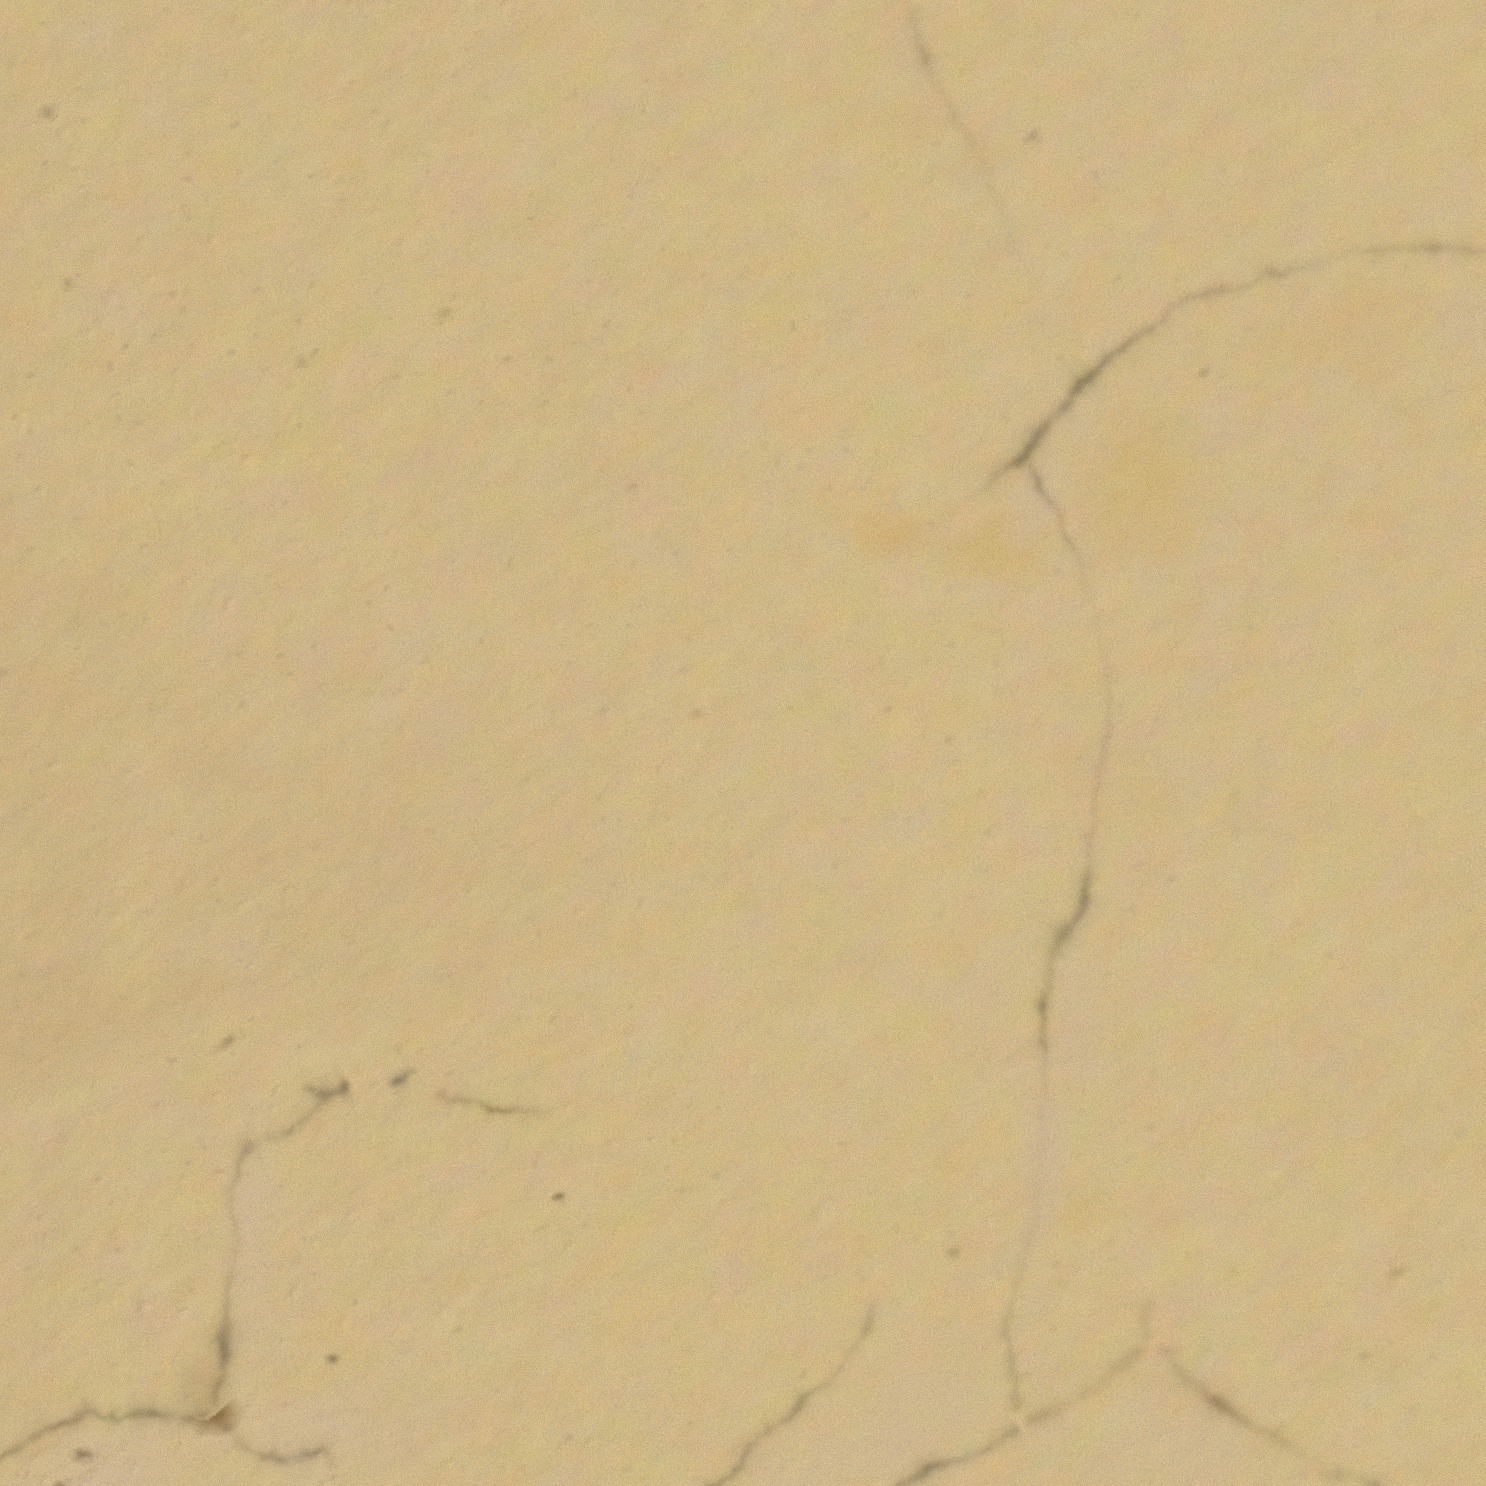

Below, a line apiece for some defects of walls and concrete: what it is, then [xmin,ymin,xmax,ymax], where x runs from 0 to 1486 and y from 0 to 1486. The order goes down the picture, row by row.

crack [864,225,1486,1486]
crack [189,1053,559,1381]
crack [0,1384,347,1481]